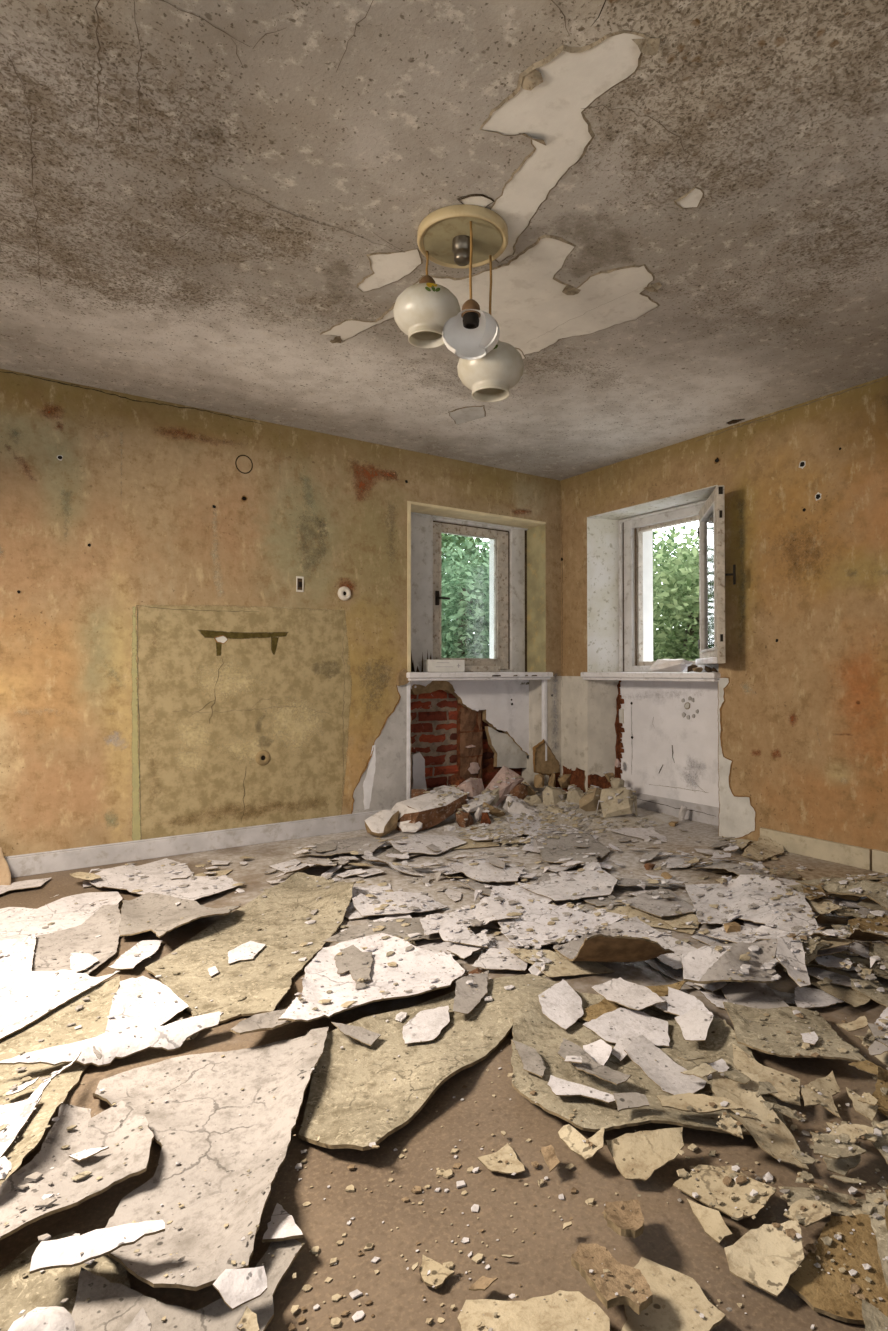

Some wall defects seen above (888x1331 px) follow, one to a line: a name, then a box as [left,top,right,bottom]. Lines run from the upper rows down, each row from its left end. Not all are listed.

crack [551,0,606,36]
crack [8,56,43,288]
peeling [357,30,662,359]
peeling [674,186,704,209]
peeling [320,303,395,343]
corrosion [352,463,395,500]
spalling [351,668,455,814]
spalling [402,677,888,1228]